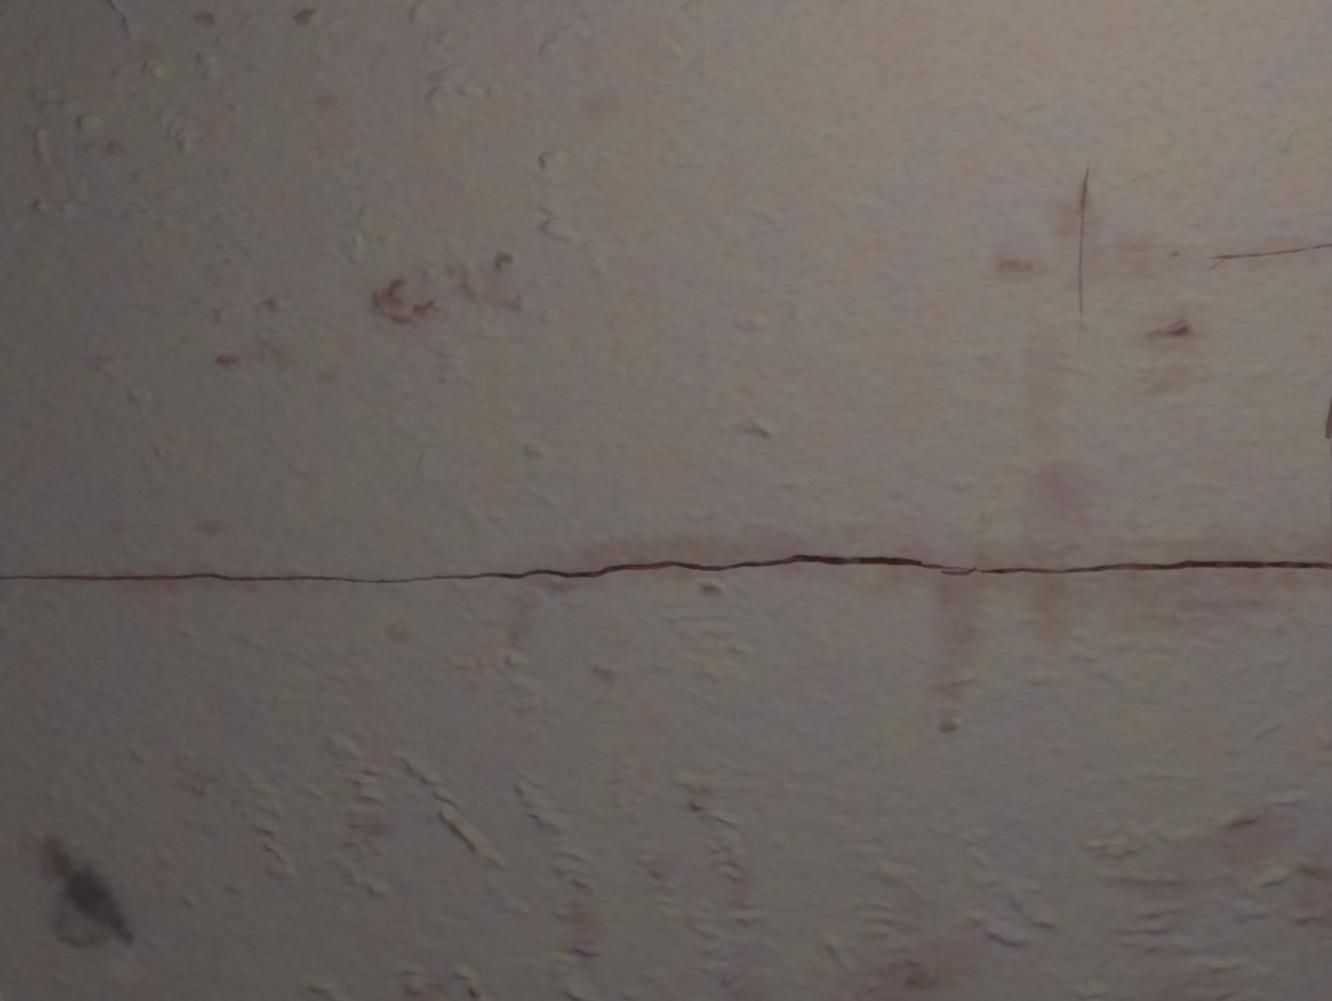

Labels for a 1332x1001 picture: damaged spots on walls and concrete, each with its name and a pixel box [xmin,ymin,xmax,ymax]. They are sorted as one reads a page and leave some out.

crack [67,573,332,581]
crack [467,555,1332,578]